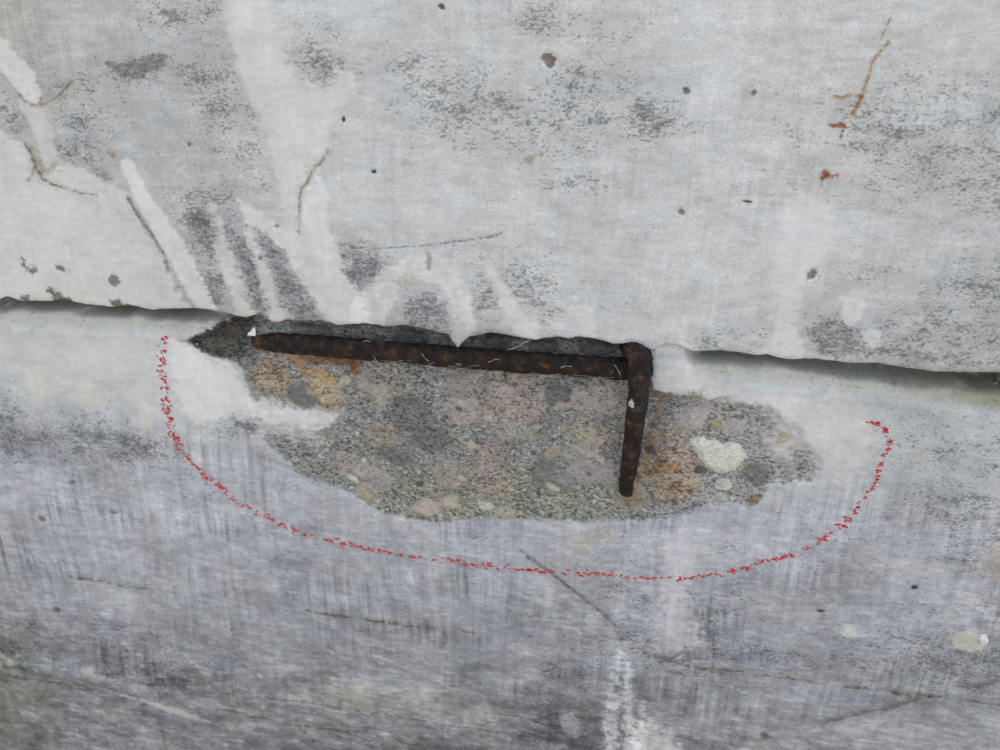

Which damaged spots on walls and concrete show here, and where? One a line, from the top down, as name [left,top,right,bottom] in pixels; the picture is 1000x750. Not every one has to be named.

water stain [615,85,687,144]
corrosion [826,120,853,141]
water stain [0,0,549,347]
corrosion [818,166,842,188]
water stain [754,188,953,372]
water stain [565,301,599,339]
corrosion [248,343,366,411]
water stain [222,392,348,450]
spalling [187,314,815,524]
corrosion [610,414,625,454]
corrosion [618,390,687,510]
water stain [272,643,688,750]